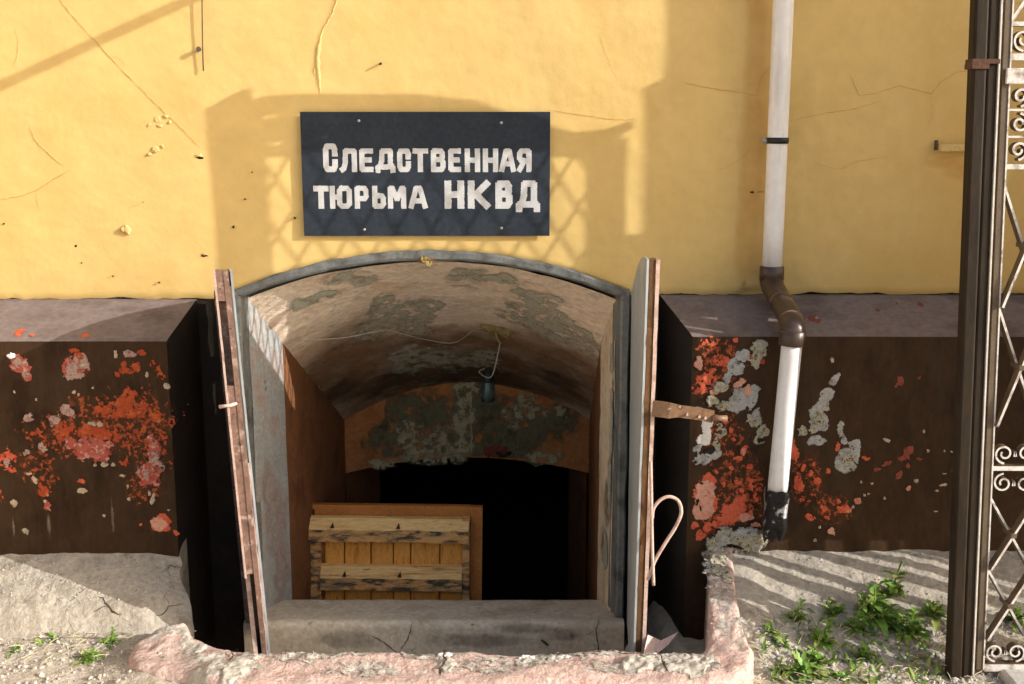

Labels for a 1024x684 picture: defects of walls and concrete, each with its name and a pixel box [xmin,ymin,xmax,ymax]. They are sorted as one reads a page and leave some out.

crack [60,0,201,149]
crack [313,0,338,95]
peeling [0,333,180,536]
leakage [291,271,377,312]
leakage [354,295,579,470]
leakage [445,268,600,359]
peeling [691,336,770,637]
spalling [791,357,930,542]